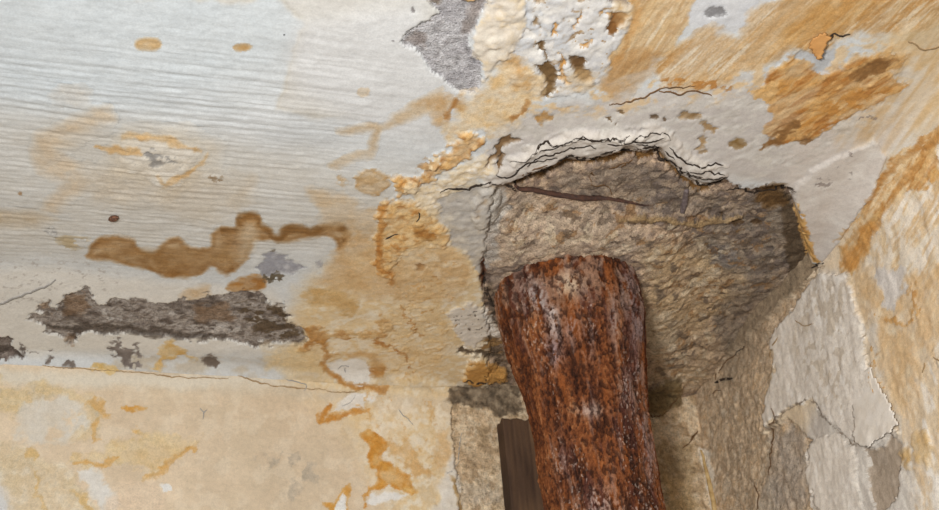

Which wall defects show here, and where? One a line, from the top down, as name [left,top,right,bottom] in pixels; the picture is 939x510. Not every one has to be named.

flaking render [391,0,640,100]
damp [0,81,394,307]
damp [325,85,455,171]
flaking render [534,110,554,127]
crack [440,132,795,195]
flaking render [0,336,76,369]
flaking render [27,249,323,370]